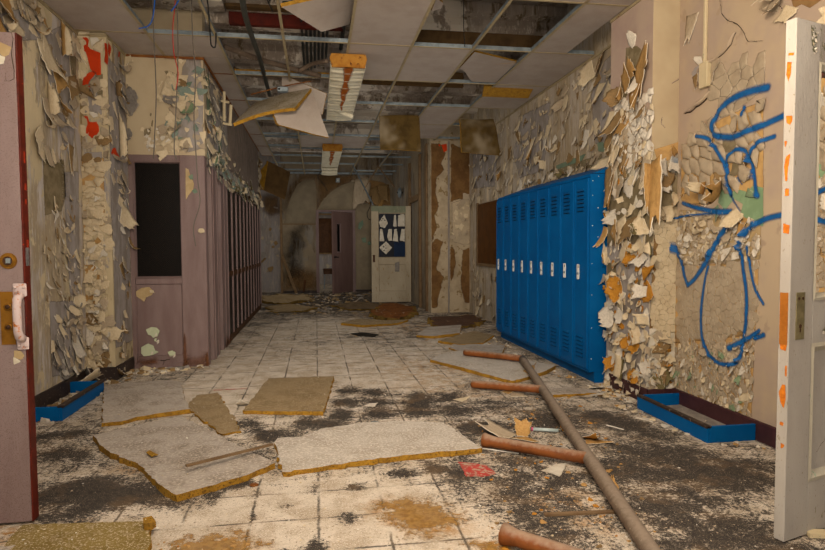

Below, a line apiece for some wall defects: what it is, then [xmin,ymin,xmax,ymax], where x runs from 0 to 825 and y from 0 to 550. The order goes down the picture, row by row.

peeling [0,0,280,381]
peeling [450,30,763,412]
crack [612,0,766,417]
spalling [779,366,787,408]
peeling [751,0,825,54]